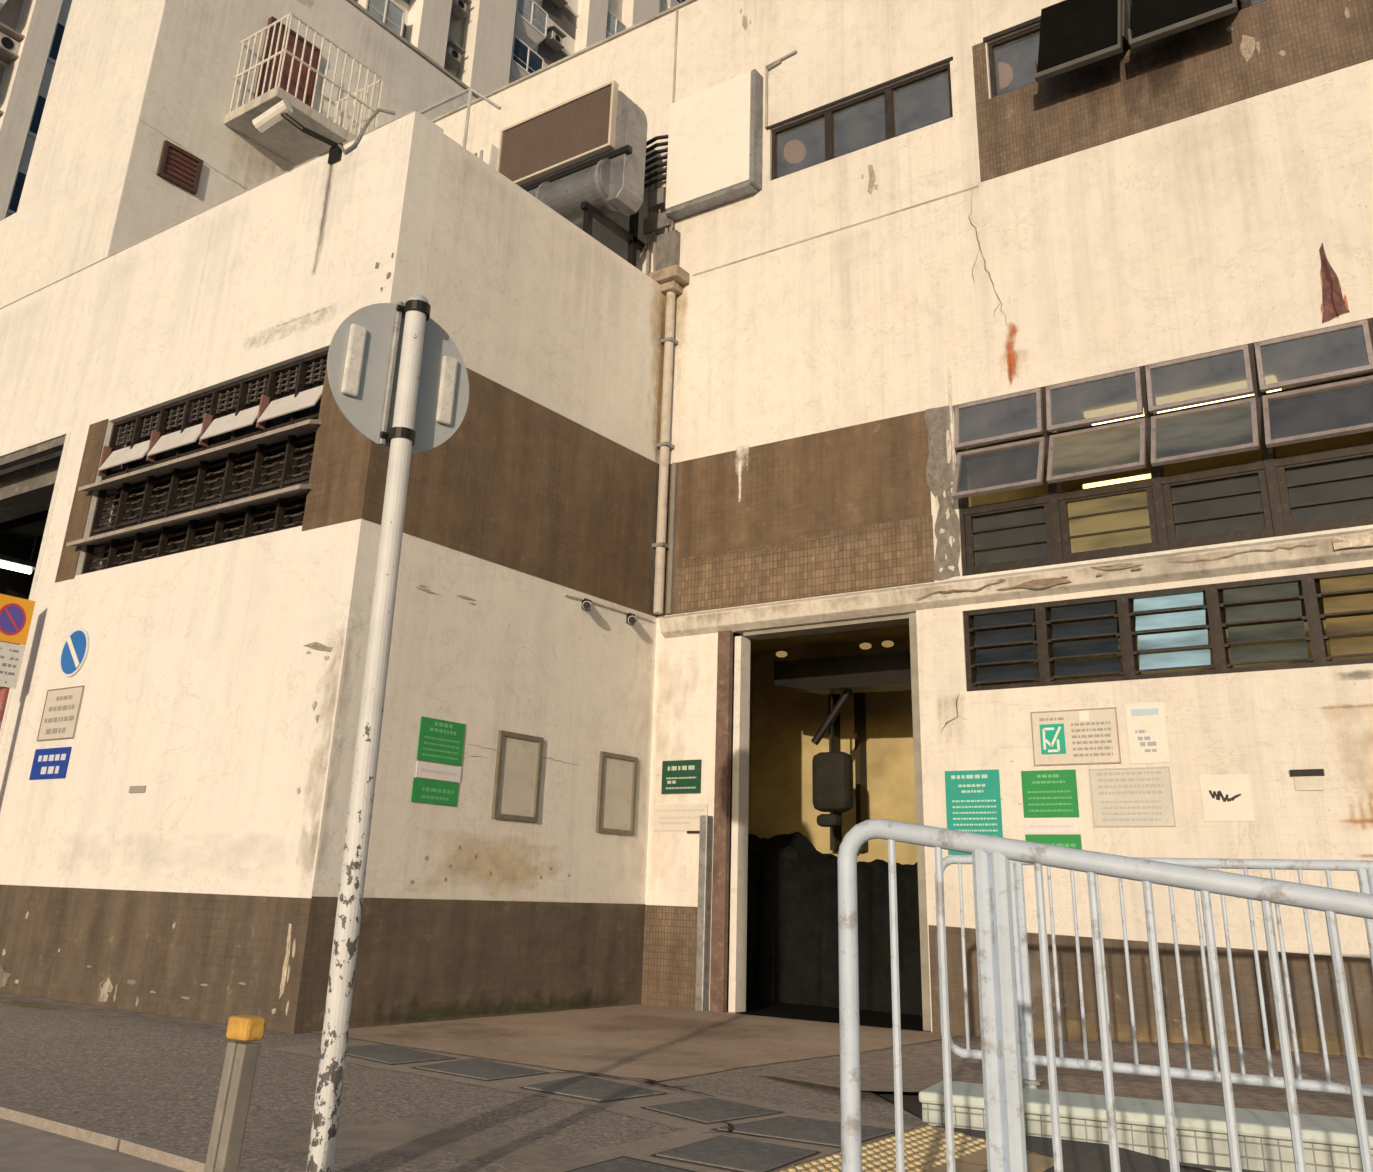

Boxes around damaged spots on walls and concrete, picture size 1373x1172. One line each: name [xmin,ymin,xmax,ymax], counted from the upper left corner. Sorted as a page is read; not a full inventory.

peeling [1226,26,1260,61]
crack [968,190,1007,325]
rust [655,295,679,437]
rust [1007,325,1016,382]
peeling [676,406,960,613]
crack [548,1070,768,1138]